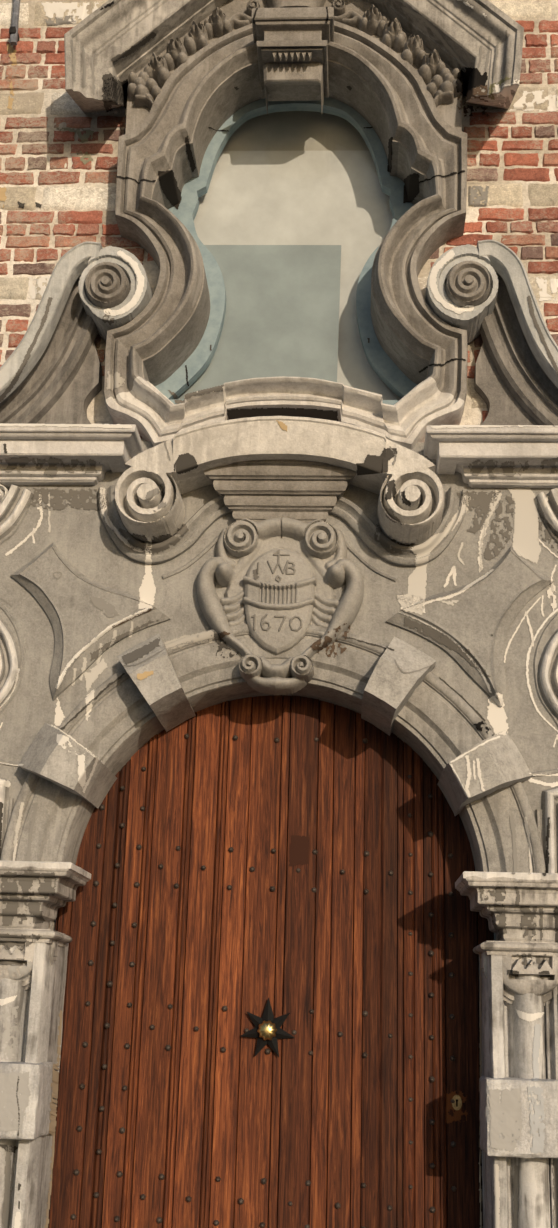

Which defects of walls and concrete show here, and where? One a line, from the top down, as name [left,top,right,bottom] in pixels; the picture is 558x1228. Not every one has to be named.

crack [116,176,156,184]
crack [418,170,465,184]
leakage [479,816,558,978]